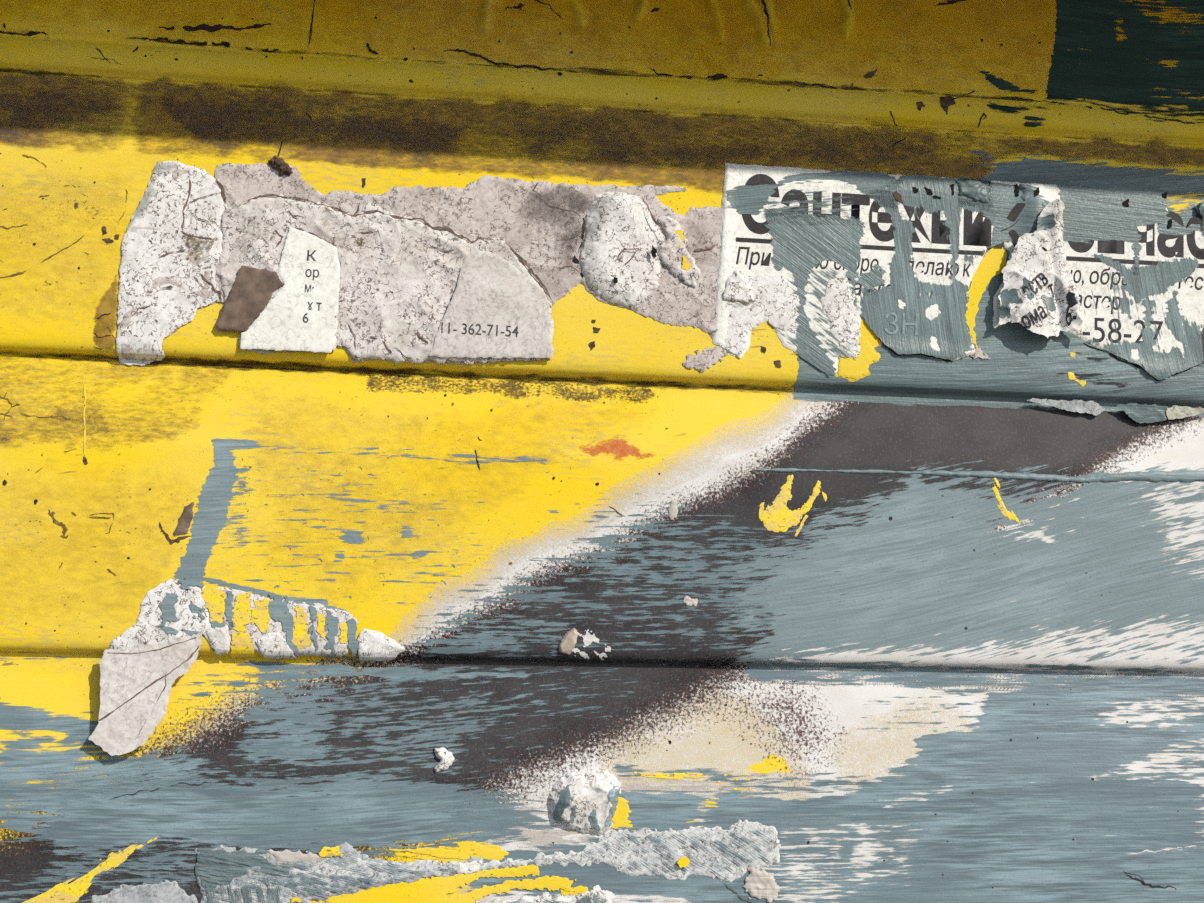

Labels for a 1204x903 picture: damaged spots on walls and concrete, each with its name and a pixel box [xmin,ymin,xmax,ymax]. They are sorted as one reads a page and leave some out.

peeling [965,246,1007,350]
peeling [838,340,880,379]
peeling [1068,352,1086,387]
peeling [434,747,455,773]
peeling [629,754,791,790]
peeling [319,797,781,903]